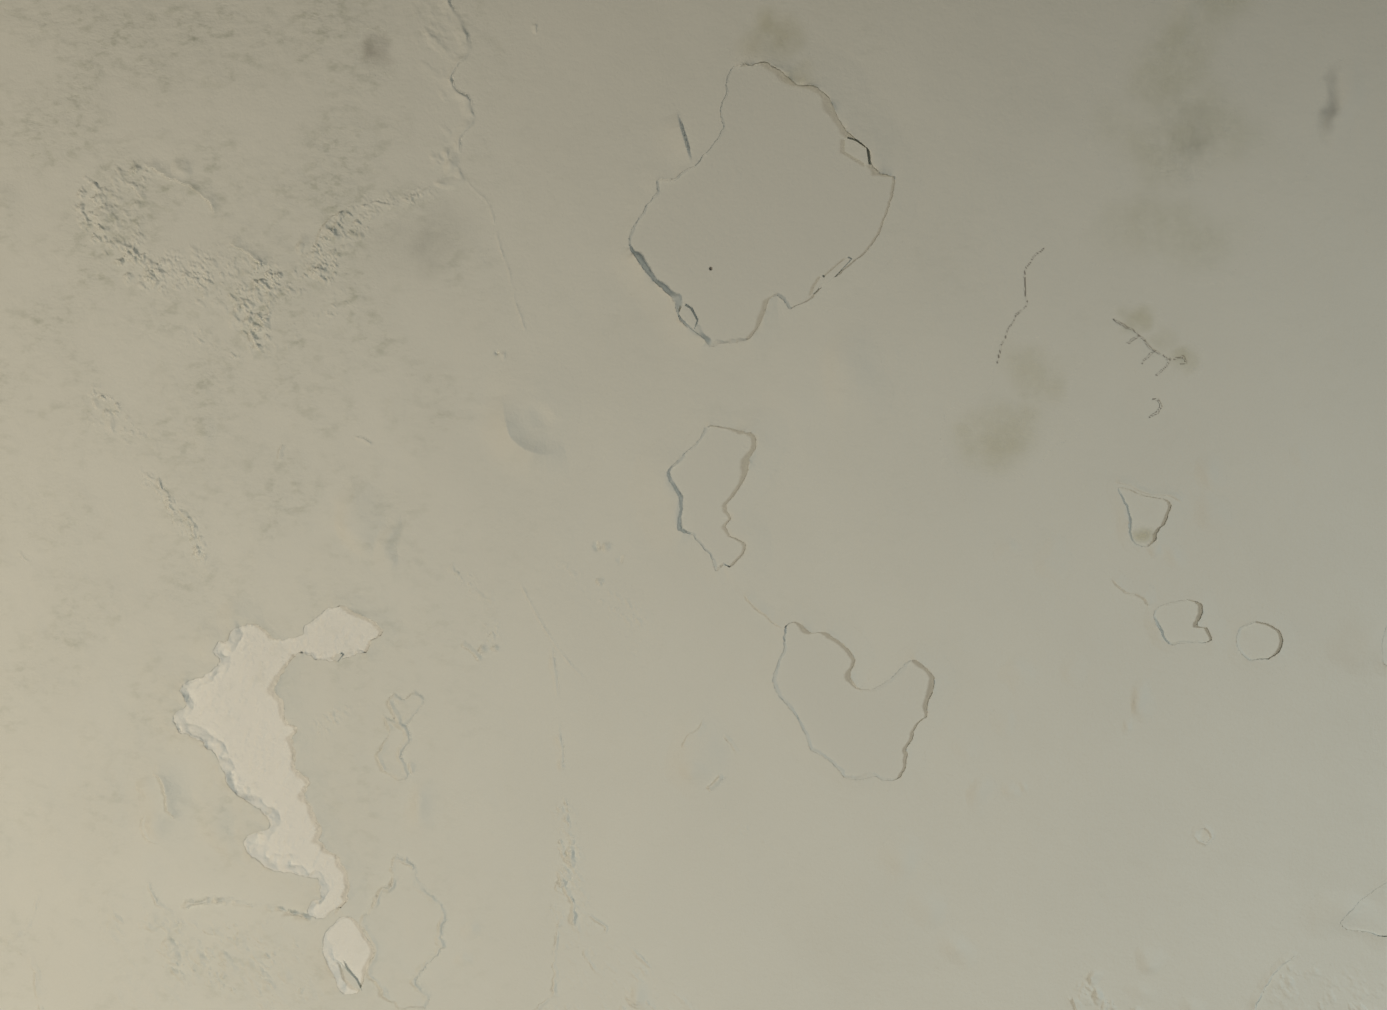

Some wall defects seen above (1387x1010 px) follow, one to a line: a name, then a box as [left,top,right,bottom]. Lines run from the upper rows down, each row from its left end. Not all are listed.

peeling [610,26,921,367]
crack [996,248,1044,363]
crack [1113,319,1187,418]
peeling [149,586,401,1005]